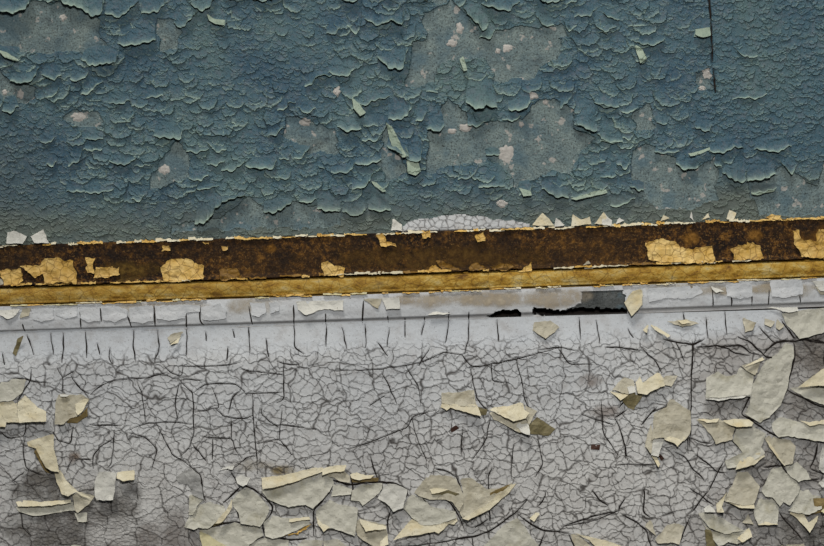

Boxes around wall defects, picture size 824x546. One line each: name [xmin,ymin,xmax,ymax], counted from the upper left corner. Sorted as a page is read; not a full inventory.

crack [708,0,716,93]
peeling [532,277,824,339]
peeling [0,379,89,427]
crack [0,289,824,546]
peeling [441,390,555,436]
peeling [610,373,677,410]
peeling [645,343,824,546]
peeling [16,434,135,522]
peeling [176,465,515,546]
peeling [484,513,540,546]
peeling [571,533,620,546]